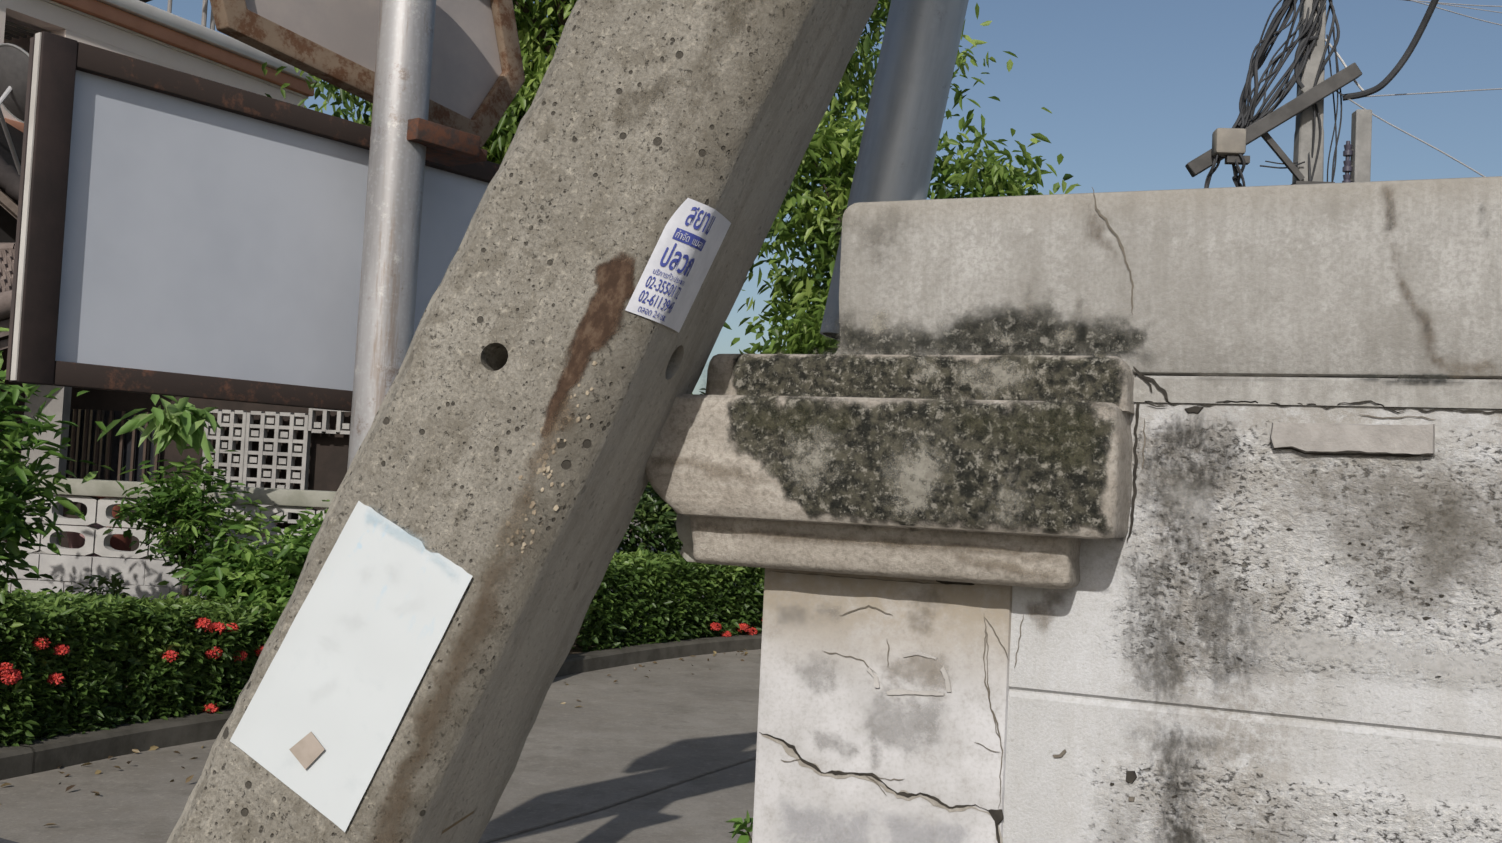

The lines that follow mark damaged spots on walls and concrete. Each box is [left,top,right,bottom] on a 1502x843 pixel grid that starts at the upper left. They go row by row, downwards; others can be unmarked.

crack [1092,187,1134,315]
rust [541,254,635,437]
water stain [837,308,1145,356]
water stain [1147,429,1228,557]
crack [759,571,1024,843]